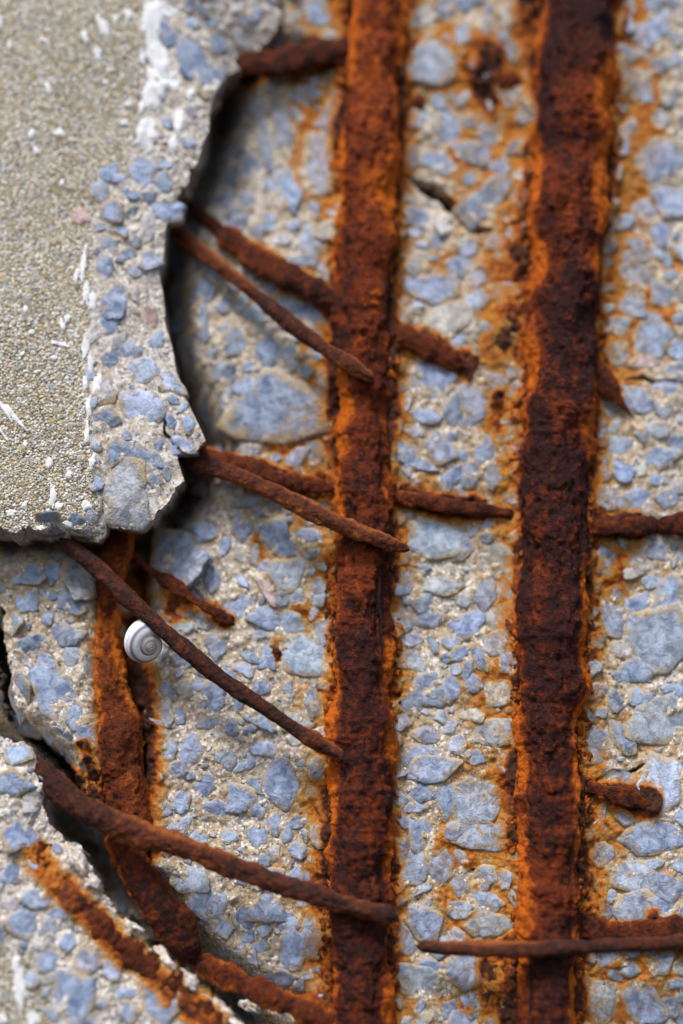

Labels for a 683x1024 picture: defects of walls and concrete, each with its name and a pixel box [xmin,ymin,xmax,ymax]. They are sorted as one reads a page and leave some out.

peeling [96,10,133,36]
peeling [133,117,158,154]
peeling [138,0,182,113]
peeling [173,106,185,133]
corrosion [230,342,340,512]
corrosion [386,0,547,1024]
corrosion [576,0,683,940]
crack [0,627,79,787]
corrosion [121,610,169,827]
corrosion [16,835,230,1024]
spalling [499,951,683,1024]
corrosion [573,950,683,1024]